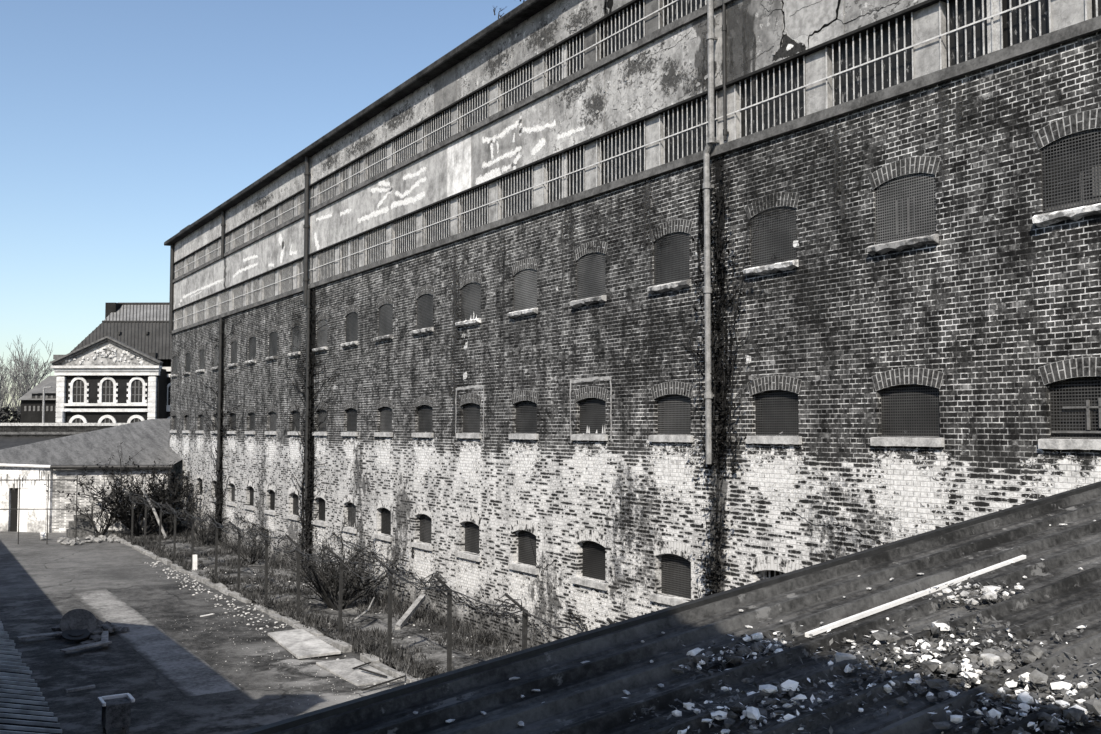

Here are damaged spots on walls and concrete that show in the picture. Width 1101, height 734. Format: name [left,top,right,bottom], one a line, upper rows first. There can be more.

damp [603,0,613,57]
flaking render [772,31,806,63]
crack [751,0,900,60]
damp [646,154,733,593]
damp [169,287,329,569]
damp [340,433,649,640]
damp [740,444,861,563]
damp [865,447,959,537]
damp [1021,449,1101,498]